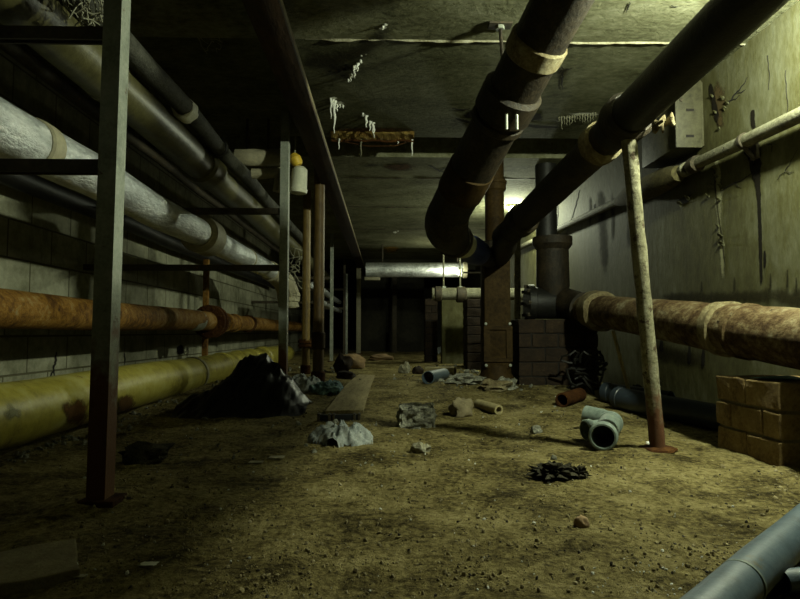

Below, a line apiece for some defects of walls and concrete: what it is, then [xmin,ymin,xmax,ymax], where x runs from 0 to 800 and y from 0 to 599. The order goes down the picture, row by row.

damp [307,23,388,82]
crack [728,78,747,104]
damp [330,97,345,133]
damp [558,112,598,128]
damp [664,142,800,307]
corrosion [64,399,89,427]